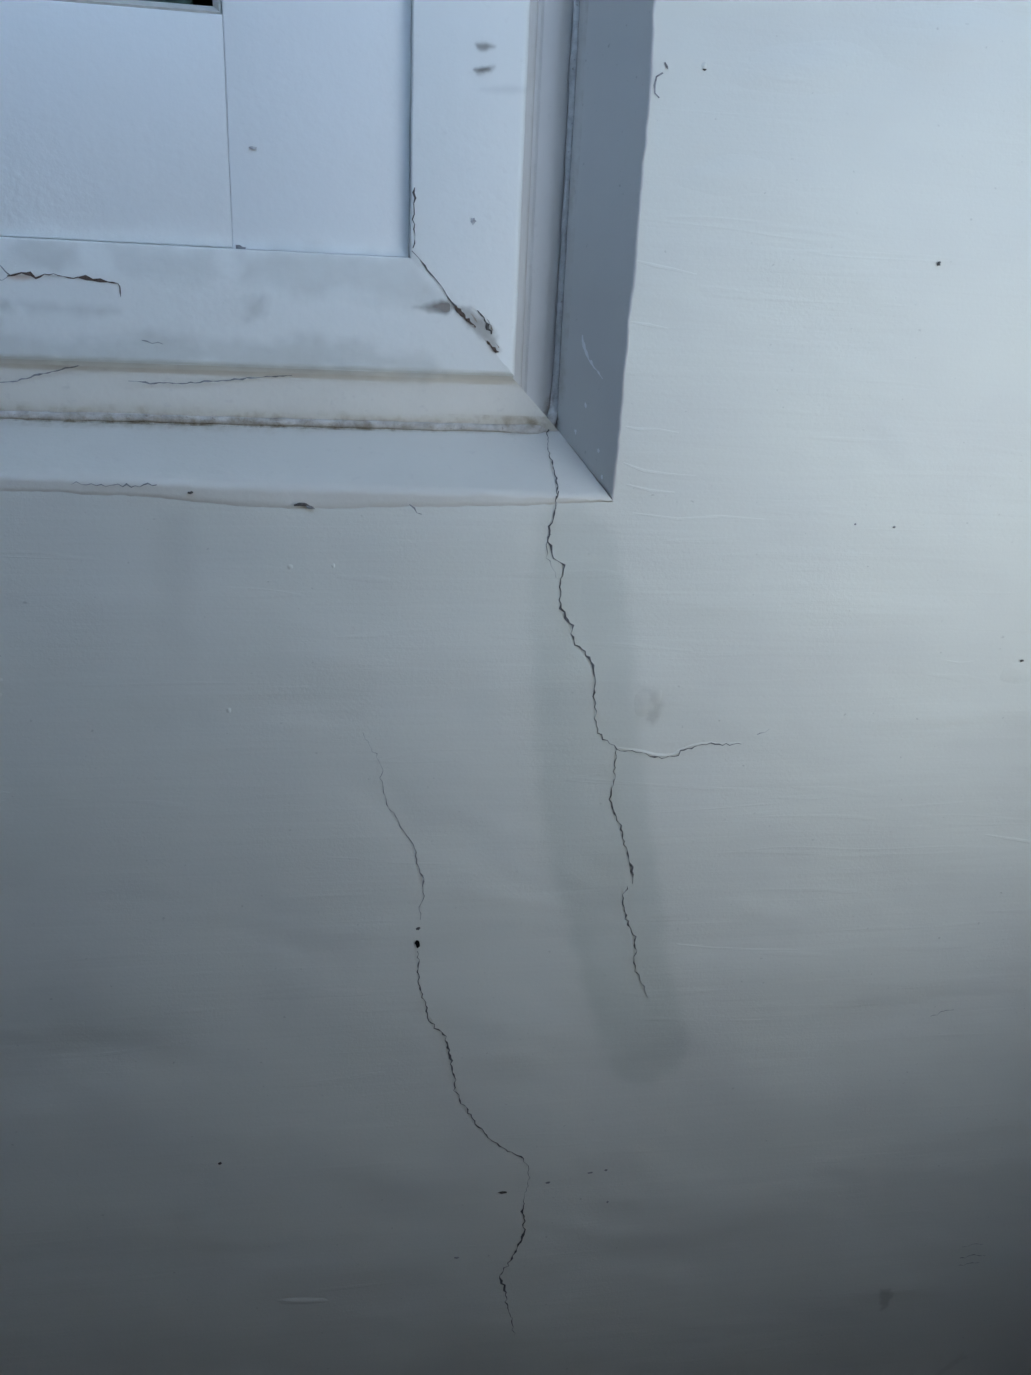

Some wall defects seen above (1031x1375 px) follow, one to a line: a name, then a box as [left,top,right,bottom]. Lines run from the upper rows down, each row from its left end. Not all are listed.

crack [546,429,769,997]
crack [363,734,530,1333]